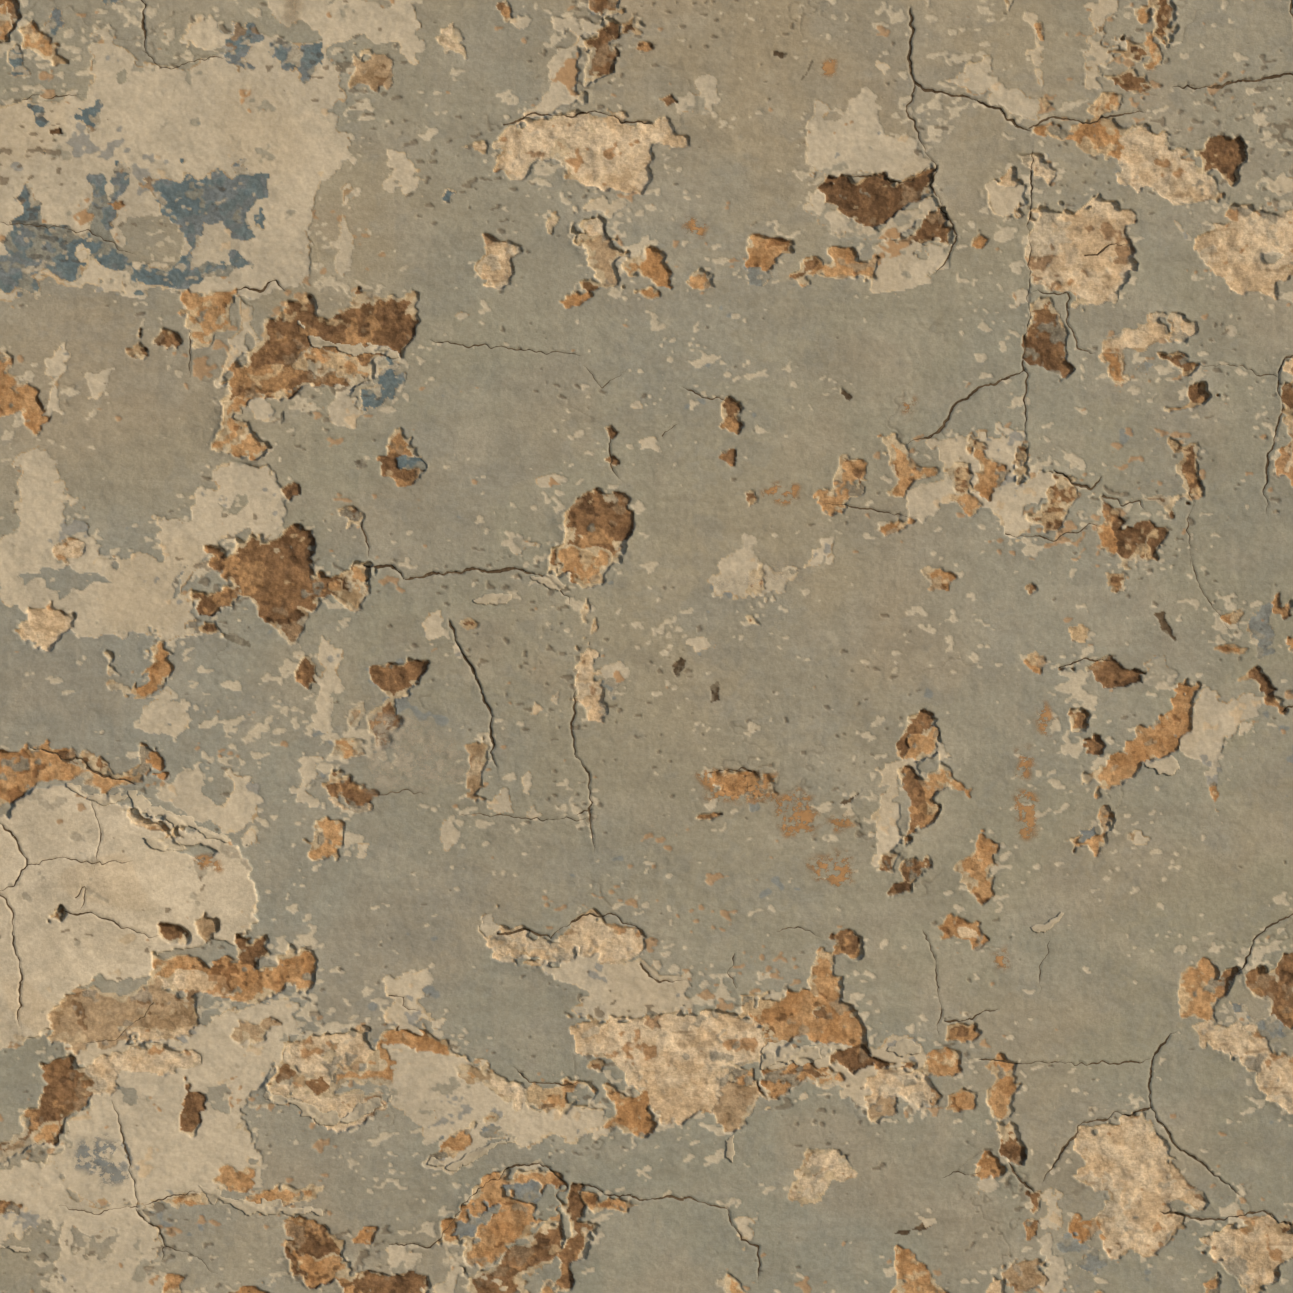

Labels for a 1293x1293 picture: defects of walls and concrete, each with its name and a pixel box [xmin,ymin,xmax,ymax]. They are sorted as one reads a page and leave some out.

flaking render [462,0,722,309]
peeling [745,87,953,294]
crack [848,8,1092,444]
flaking render [946,0,1293,301]
crack [1173,73,1293,90]
peeling [0,0,512,862]
crack [1201,355,1293,510]
crack [449,621,497,766]
crack [457,691,595,850]
peeling [0,905,1028,1293]
flaking render [986,1113,1209,1293]
crack [978,1032,1293,1226]